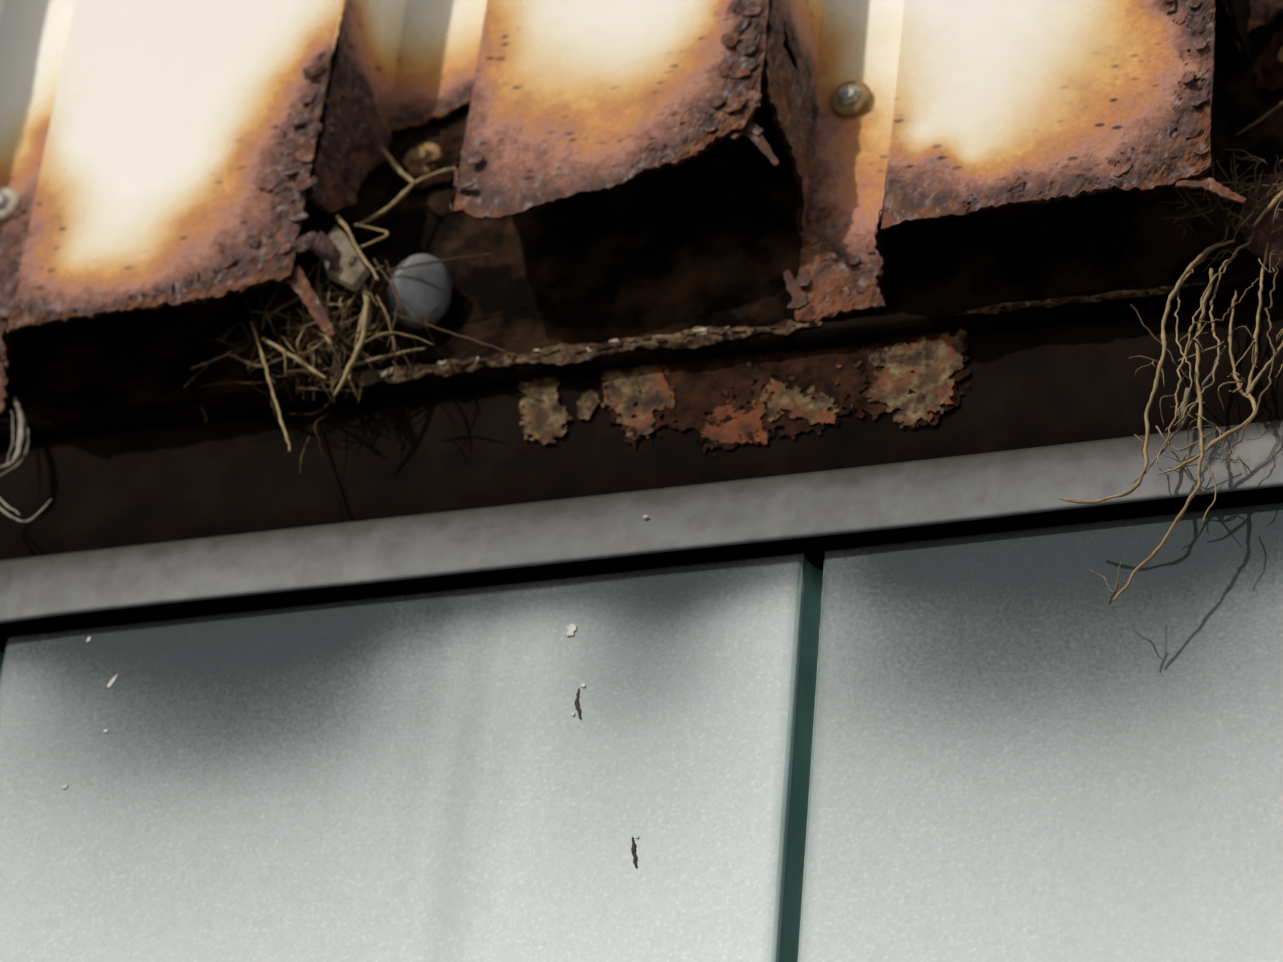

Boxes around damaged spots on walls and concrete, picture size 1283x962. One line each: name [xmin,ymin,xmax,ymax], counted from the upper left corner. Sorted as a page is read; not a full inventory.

rust [0,0,1283,415]
peeling [518,327,971,455]